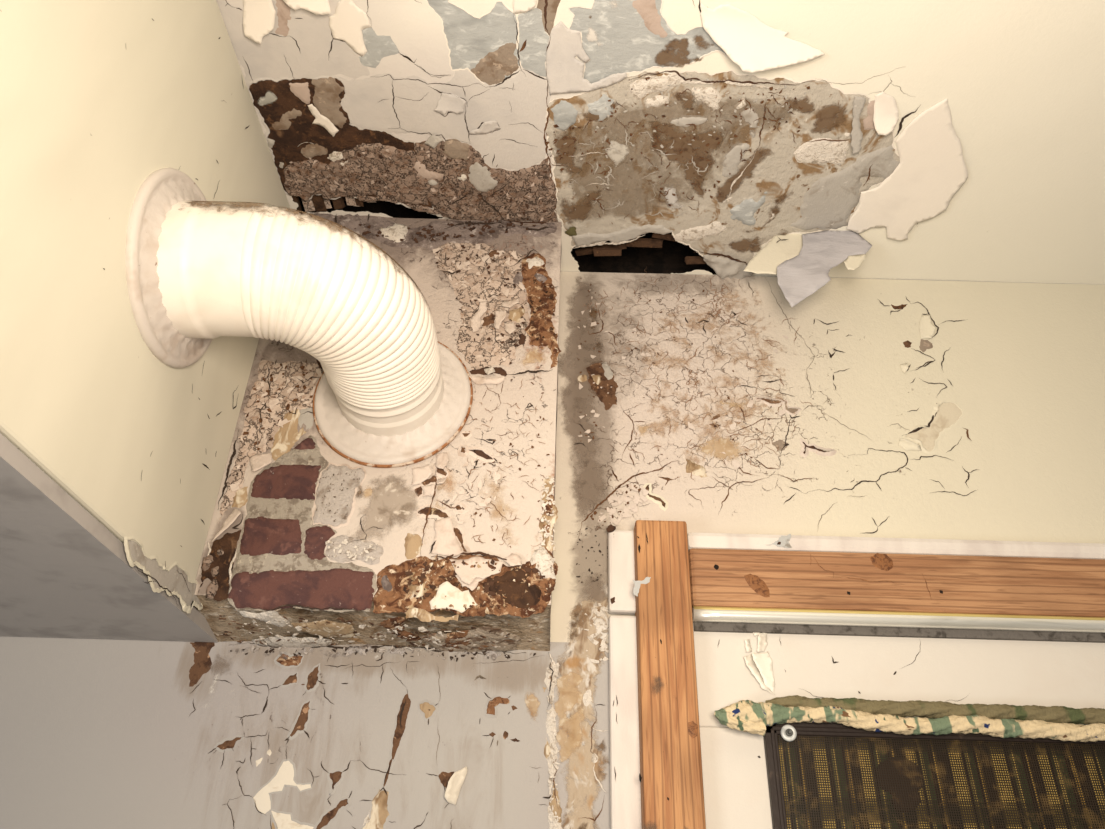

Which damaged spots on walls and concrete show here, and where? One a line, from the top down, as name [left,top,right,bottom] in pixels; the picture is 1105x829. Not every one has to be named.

peeling [217,0,825,370]
crack [492,0,561,221]
flaking render [124,360,536,662]
rust [372,476,558,622]
crack [578,407,680,538]
crack [685,282,978,533]
peeling [223,749,318,829]
crack [209,643,441,829]
peeling [429,767,467,806]
spalling [525,653,584,829]